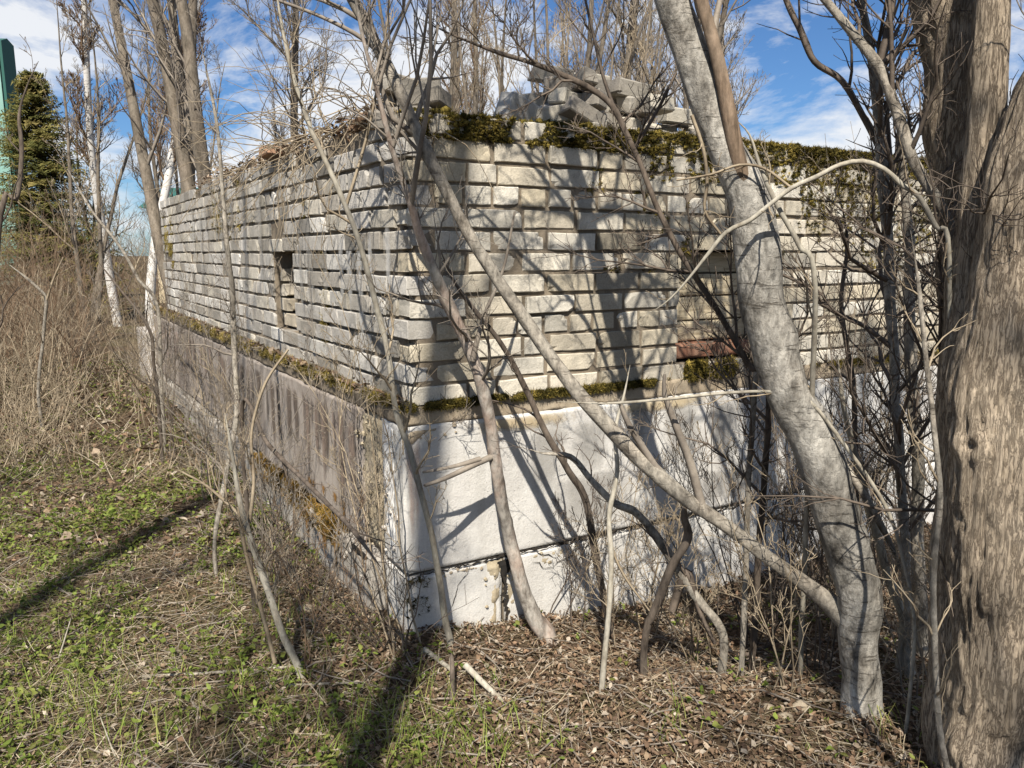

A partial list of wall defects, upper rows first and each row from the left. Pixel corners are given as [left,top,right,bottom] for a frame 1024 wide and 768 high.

damp [157,325,355,492]
spalling [442,557,514,623]